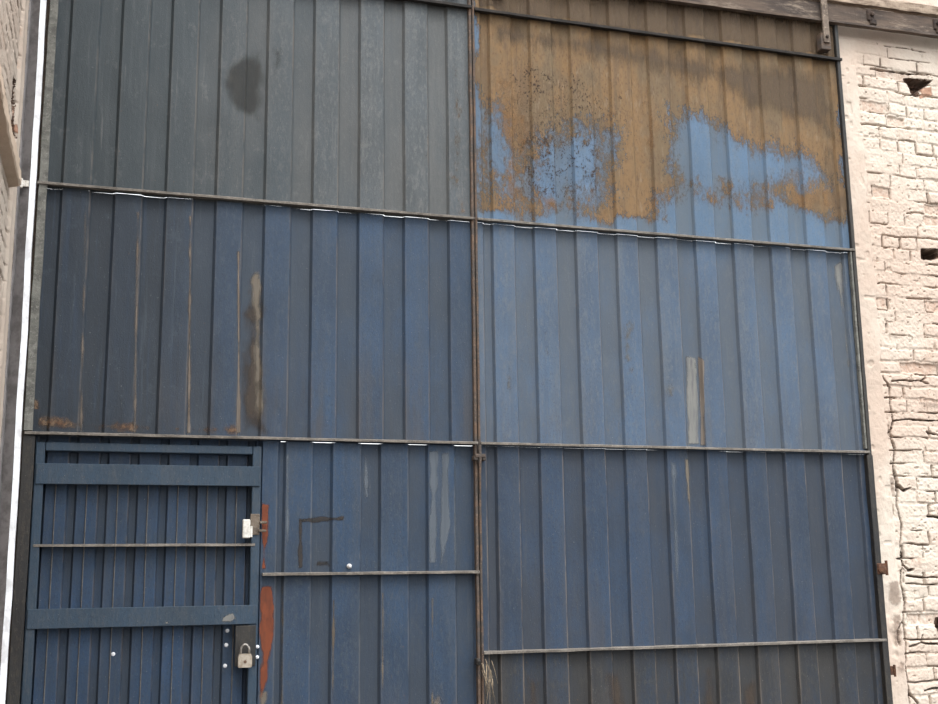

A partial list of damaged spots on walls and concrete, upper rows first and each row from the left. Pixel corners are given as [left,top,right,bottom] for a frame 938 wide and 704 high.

hole [903,78,932,98]
rust [259,586,274,704]